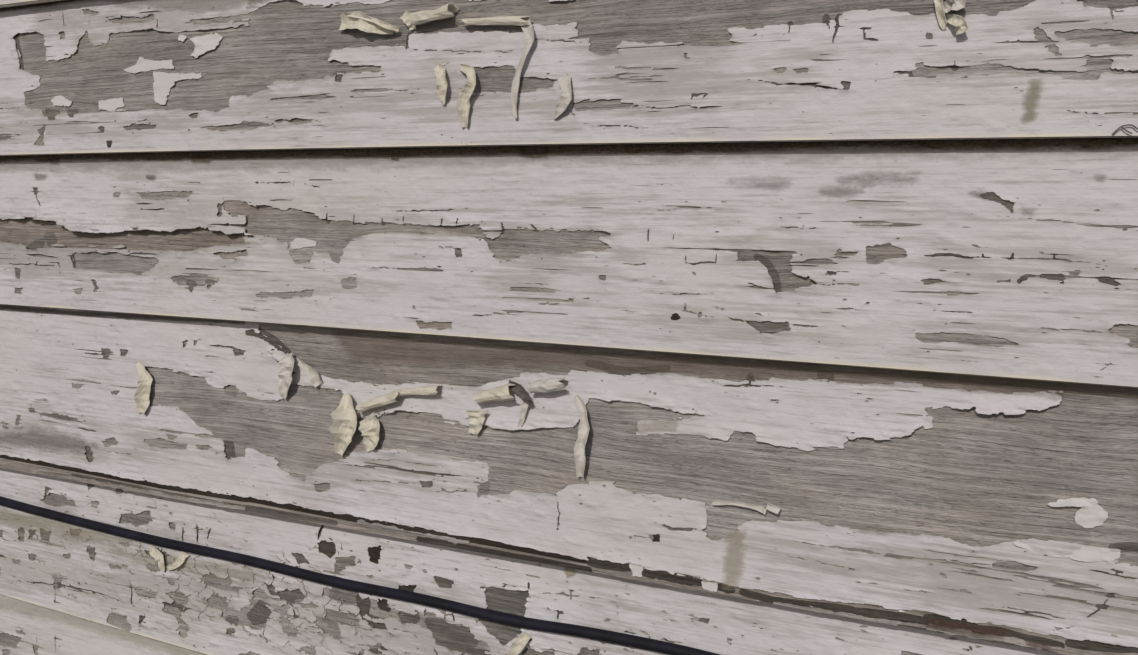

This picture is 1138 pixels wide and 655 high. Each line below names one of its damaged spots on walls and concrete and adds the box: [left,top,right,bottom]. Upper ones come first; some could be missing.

peeling [1062,0,1138,12]
peeling [13,0,1036,145]
peeling [912,23,1138,80]
peeling [0,200,611,294]
peeling [734,249,815,293]
peeling [835,243,907,264]
peeling [1017,270,1128,289]
peeling [0,408,130,462]
peeling [41,487,76,506]
peeling [86,318,1138,620]
peeling [19,522,211,613]
peeling [202,525,601,655]